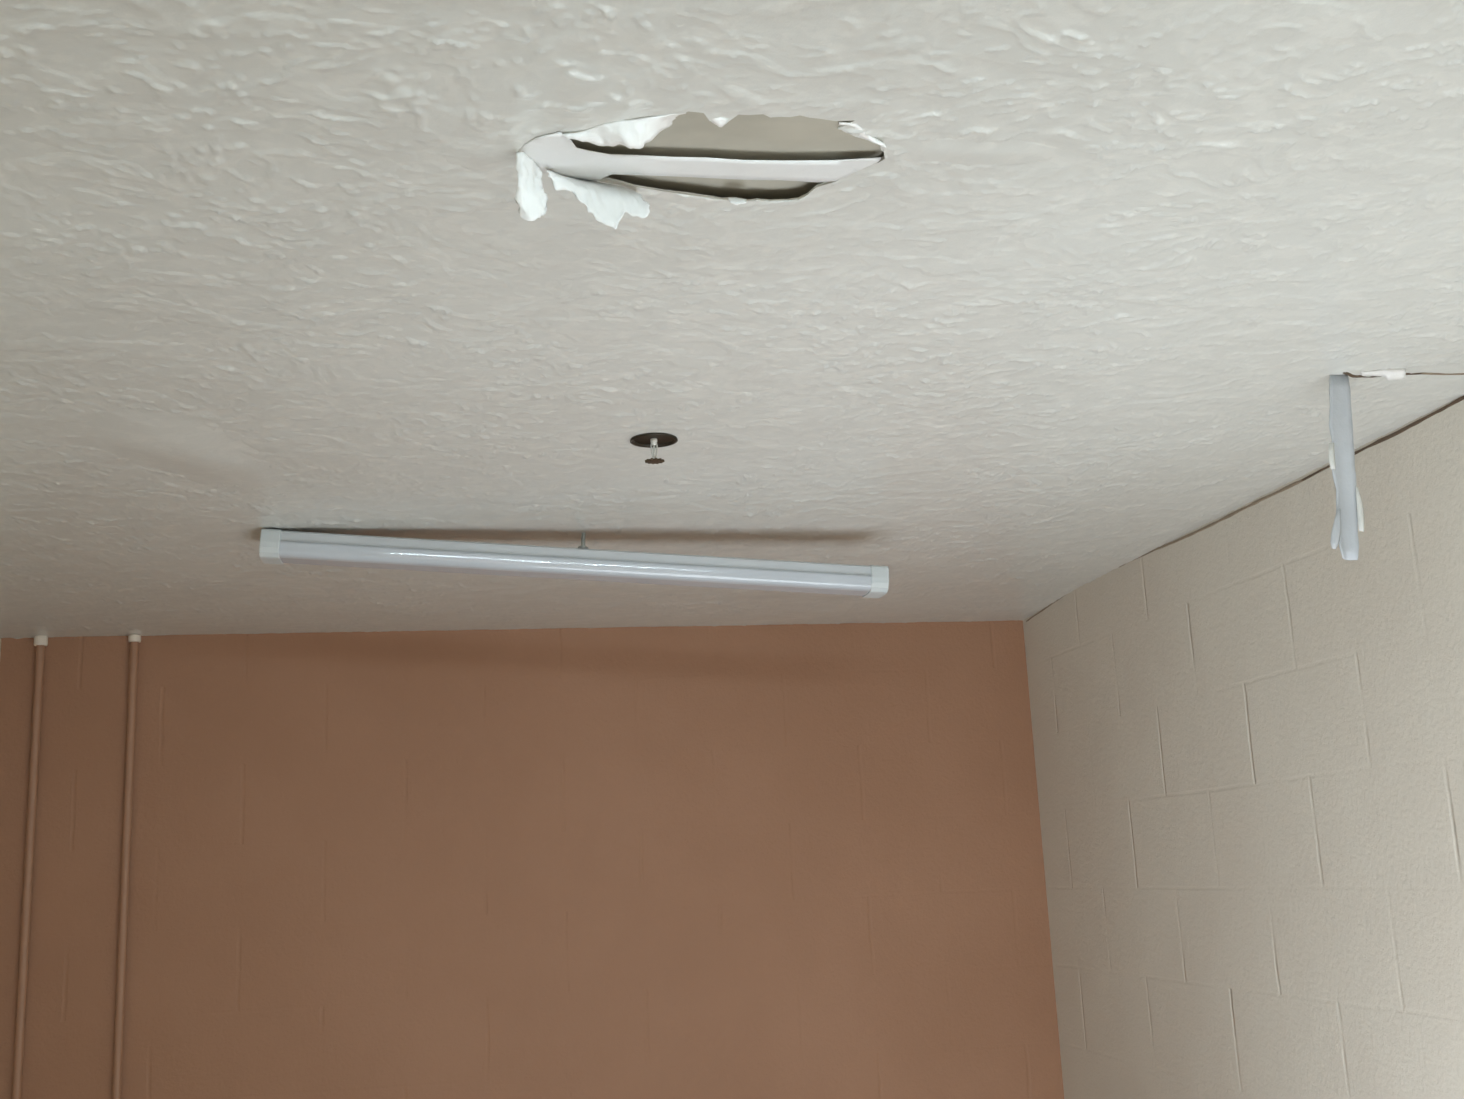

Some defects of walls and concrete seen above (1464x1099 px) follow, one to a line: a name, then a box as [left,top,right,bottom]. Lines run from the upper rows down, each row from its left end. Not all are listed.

peeling [442,112,1058,230]
peeling [1328,374,1364,560]